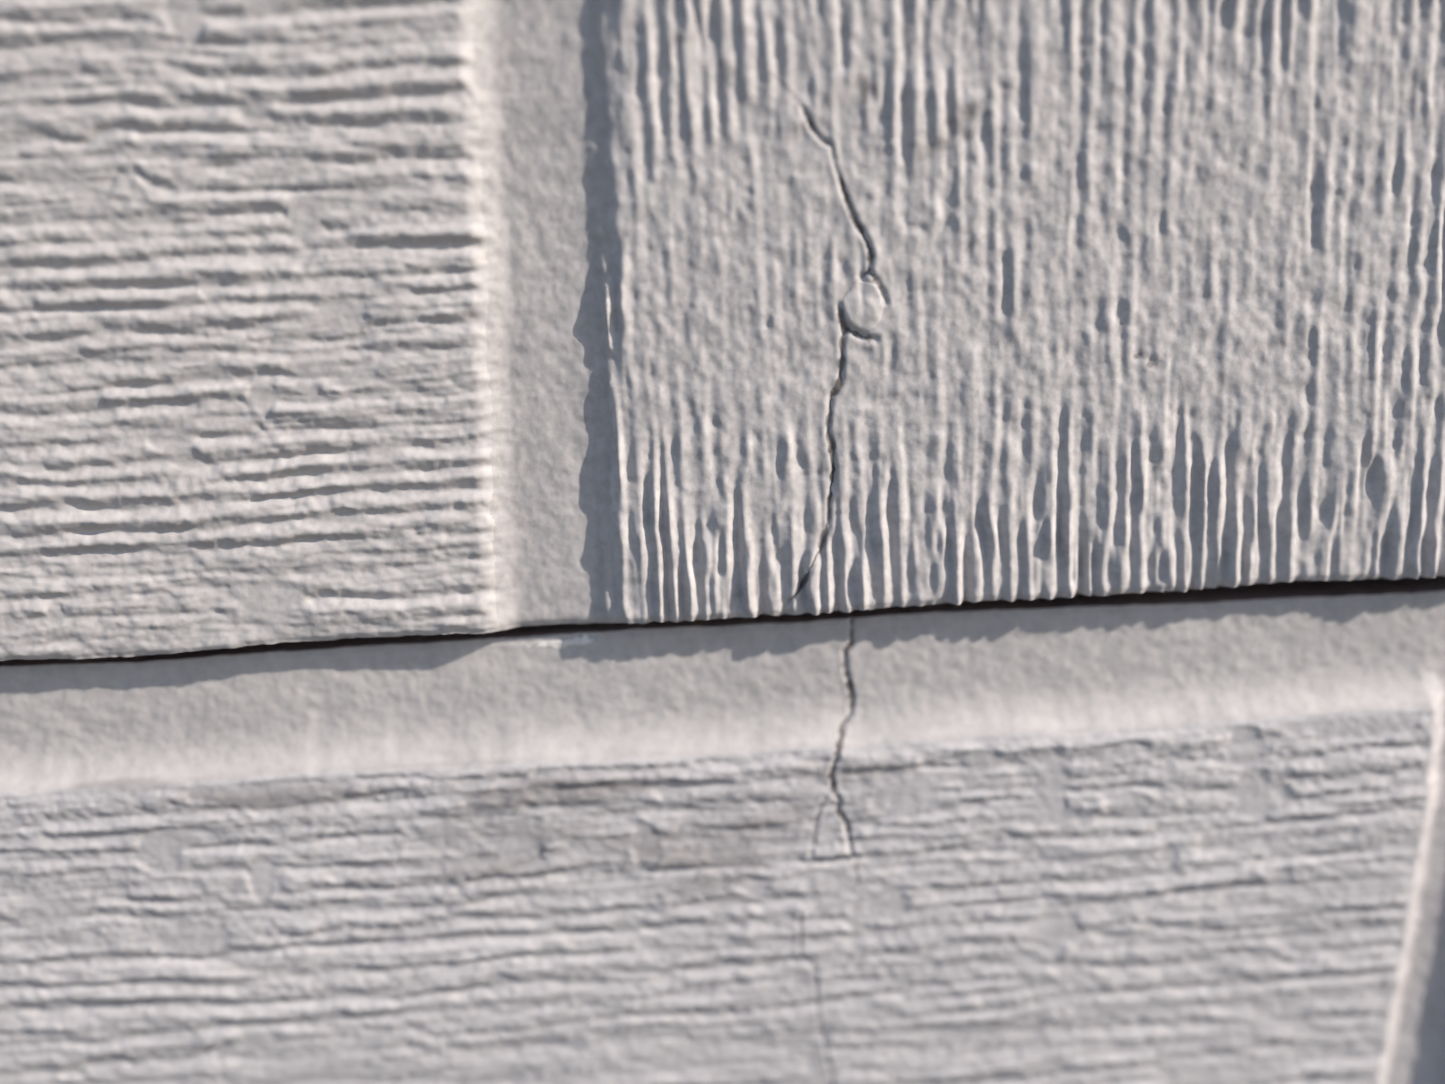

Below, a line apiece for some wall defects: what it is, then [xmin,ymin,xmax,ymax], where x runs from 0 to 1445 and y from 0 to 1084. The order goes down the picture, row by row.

crack [794,120,884,596]
crack [810,621,859,882]